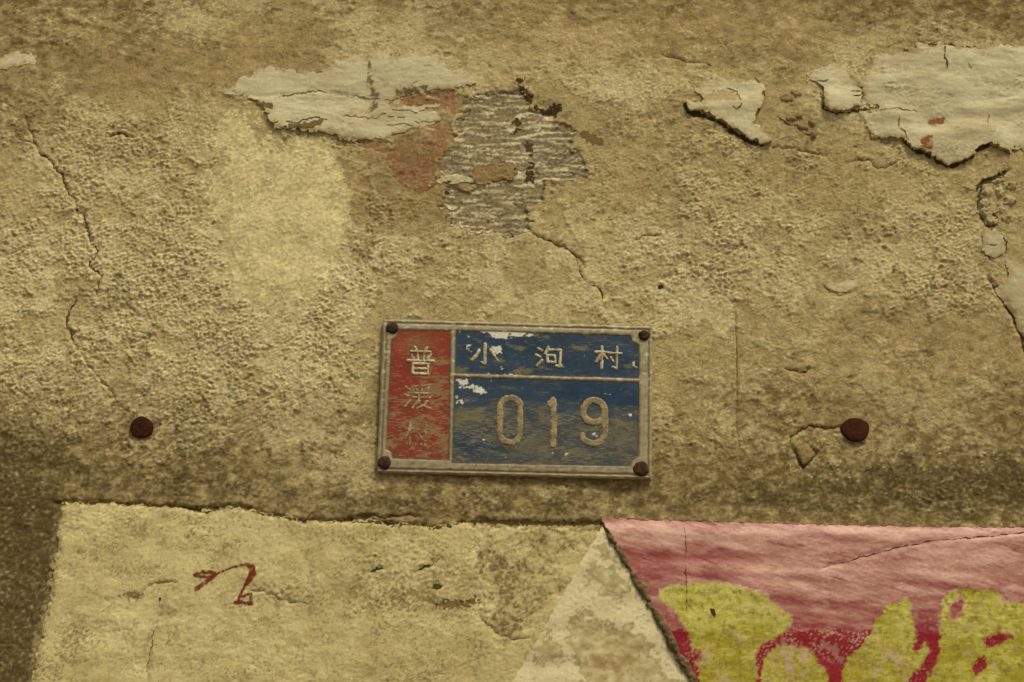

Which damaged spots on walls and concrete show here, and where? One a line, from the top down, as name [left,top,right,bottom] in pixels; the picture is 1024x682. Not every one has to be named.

spalling [224,51,604,238]
peeling [683,77,772,147]
peeling [779,42,1024,169]
crack [16,118,128,411]
crack [534,234,603,301]
peeling [974,170,1024,337]
crack [790,425,840,469]